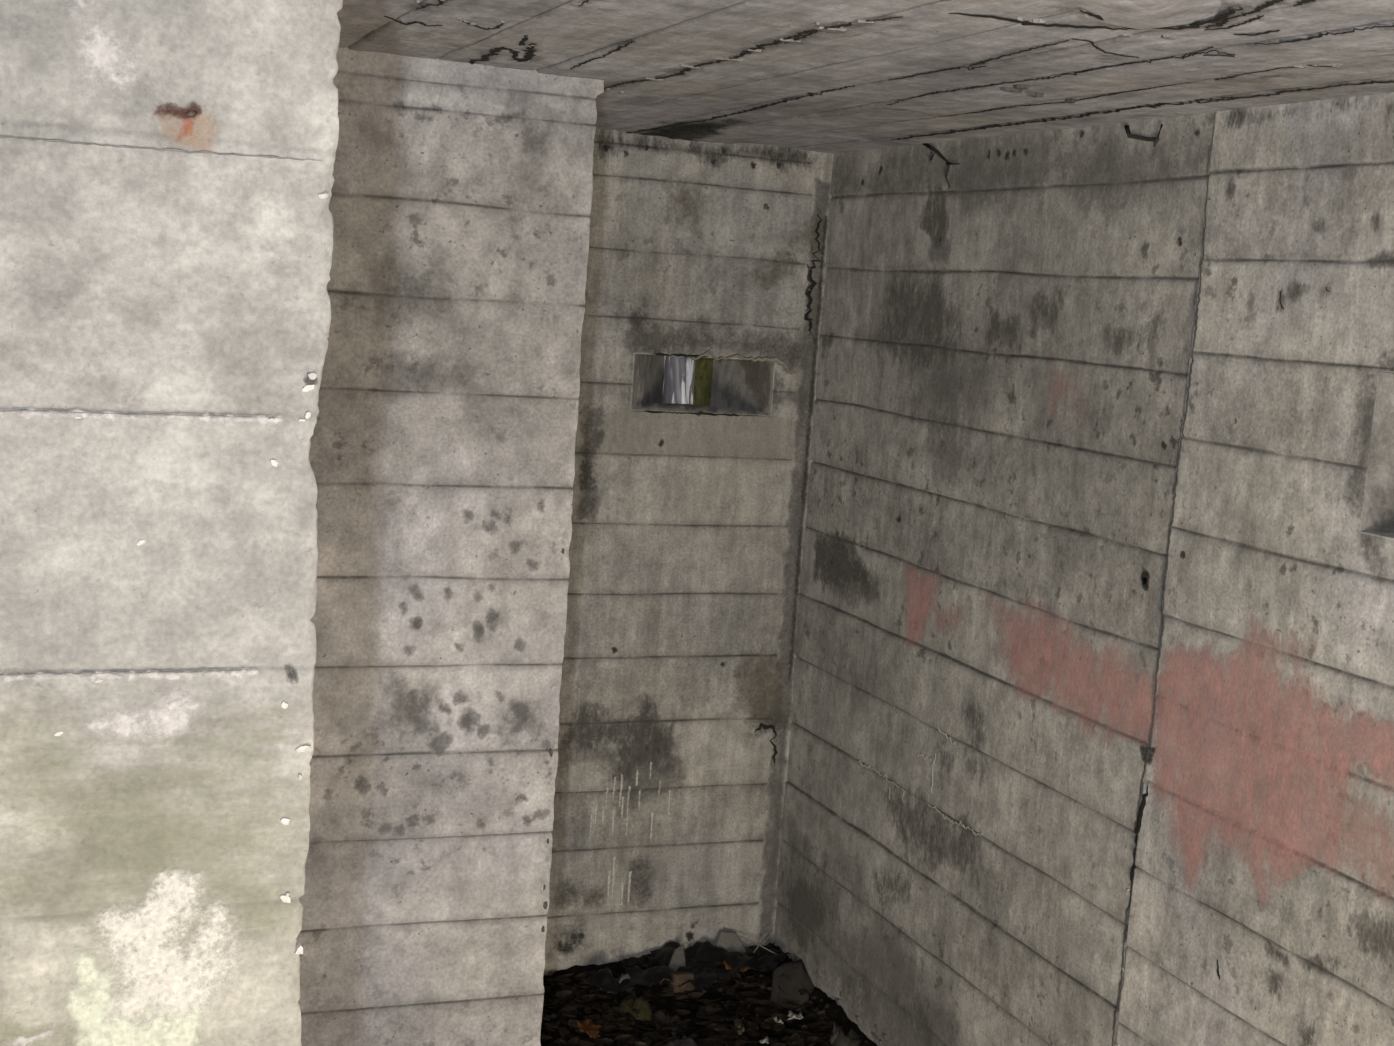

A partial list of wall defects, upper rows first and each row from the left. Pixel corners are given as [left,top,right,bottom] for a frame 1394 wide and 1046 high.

corrosion [157,103,208,143]
crack [384,0,536,64]
crack [570,16,903,94]
crack [627,85,855,133]
crack [887,0,1394,140]
damp [631,317,714,354]
crack [804,209,822,339]
damp [743,179,956,1046]
crack [1112,146,1210,1046]
damp [560,700,681,841]
damp [857,706,983,870]
damp [560,856,650,905]